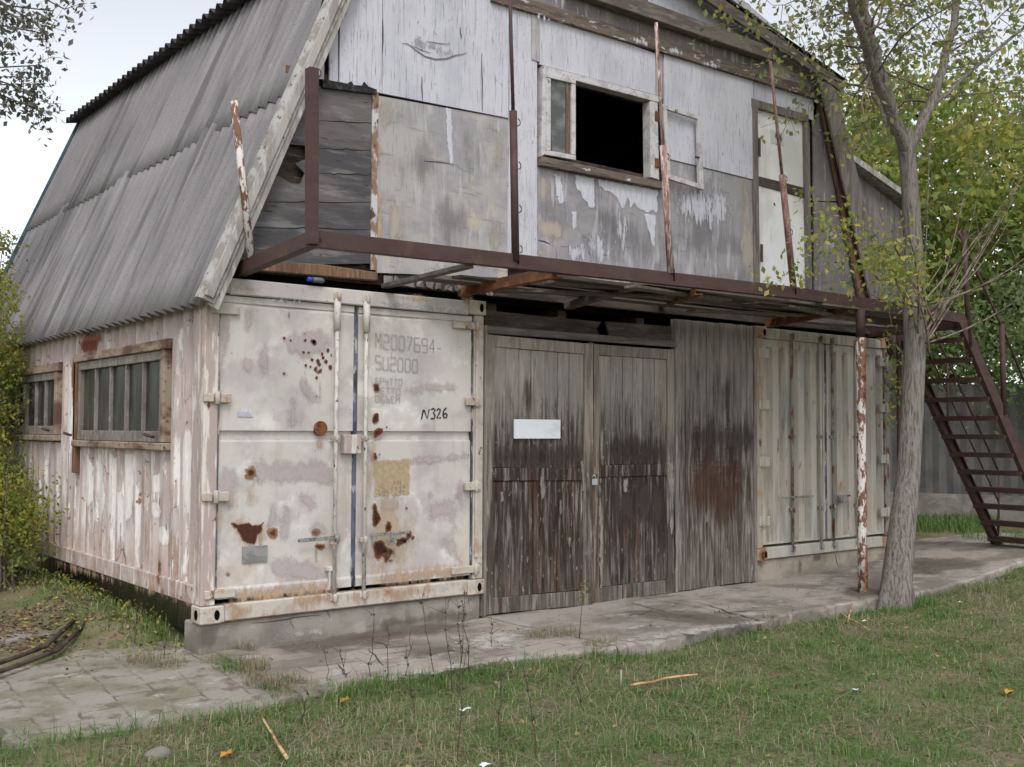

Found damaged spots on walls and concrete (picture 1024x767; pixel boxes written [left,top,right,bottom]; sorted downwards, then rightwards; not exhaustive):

peeling [554,174,577,230]
peeling [575,175,658,246]
corrosion [283,333,332,397]
peeling [86,452,134,551]
peeling [151,473,170,547]
peeling [182,428,192,524]
corrosion [245,466,256,498]
corrosion [231,521,278,546]
corrosion [311,528,325,562]
corrosion [369,413,456,596]
leakage [494,439,581,468]
leakage [681,382,752,527]